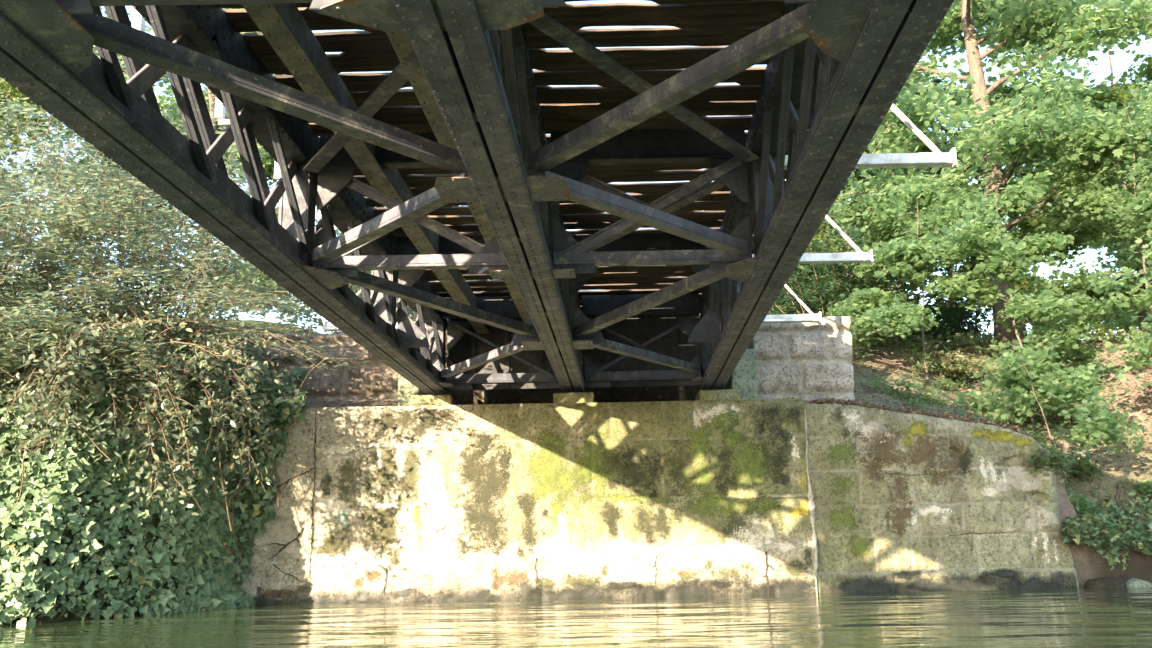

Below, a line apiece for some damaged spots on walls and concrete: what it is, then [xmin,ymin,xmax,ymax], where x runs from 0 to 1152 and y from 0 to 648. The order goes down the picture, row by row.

crack [265,418,320,596]
water stain [253,420,1077,605]